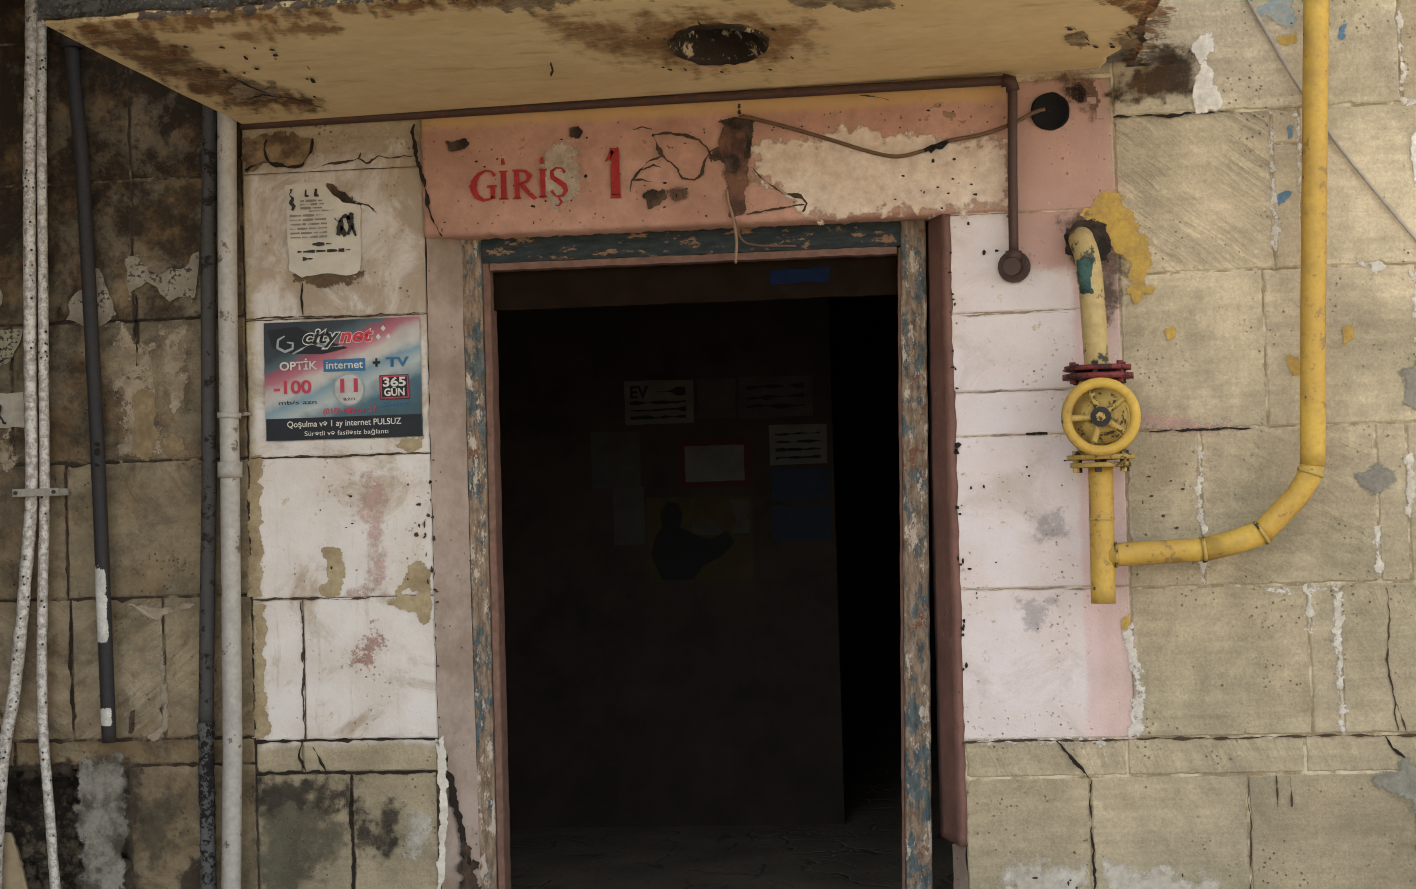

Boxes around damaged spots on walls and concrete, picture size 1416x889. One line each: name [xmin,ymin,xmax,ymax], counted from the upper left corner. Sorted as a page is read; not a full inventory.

peeling [472,0,574,15]
peeling [788,0,903,13]
spalling [647,21,776,73]
peeling [1064,28,1147,51]
crack [313,124,442,237]
crack [630,126,719,192]
hole [1064,219,1111,262]
peeling [304,547,357,599]
leakage [255,770,399,889]
spalling [457,840,482,889]